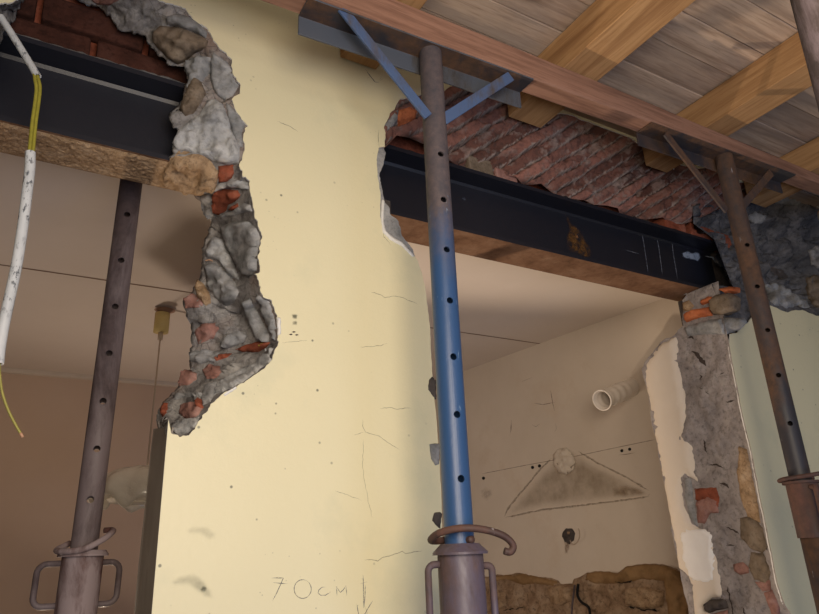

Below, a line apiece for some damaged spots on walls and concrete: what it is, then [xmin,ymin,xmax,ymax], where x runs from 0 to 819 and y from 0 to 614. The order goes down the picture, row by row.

spalling [0,0,24,45]
flaking render [444,86,474,111]
spalling [77,0,281,437]
flaking render [377,95,424,257]
flaking render [446,98,751,321]
spalling [740,183,819,316]
flaking render [485,564,689,614]